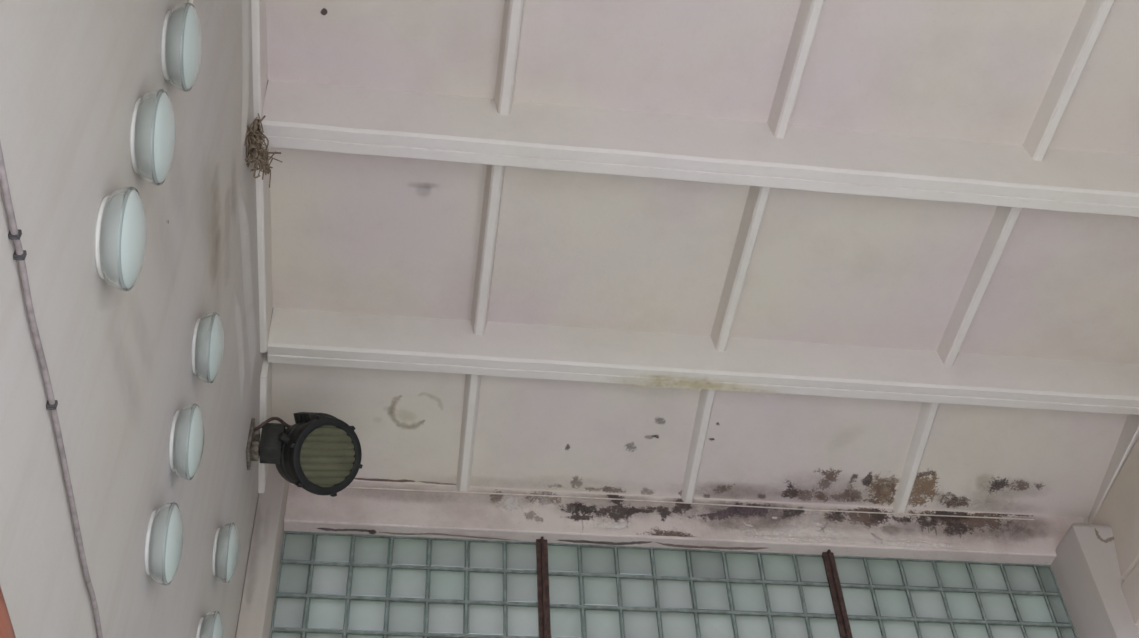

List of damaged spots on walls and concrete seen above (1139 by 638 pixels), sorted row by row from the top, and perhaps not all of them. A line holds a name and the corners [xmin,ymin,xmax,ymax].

water stain [818,469,872,486]
water stain [989,478,1042,492]
water stain [561,487,769,522]
water stain [782,481,1033,535]